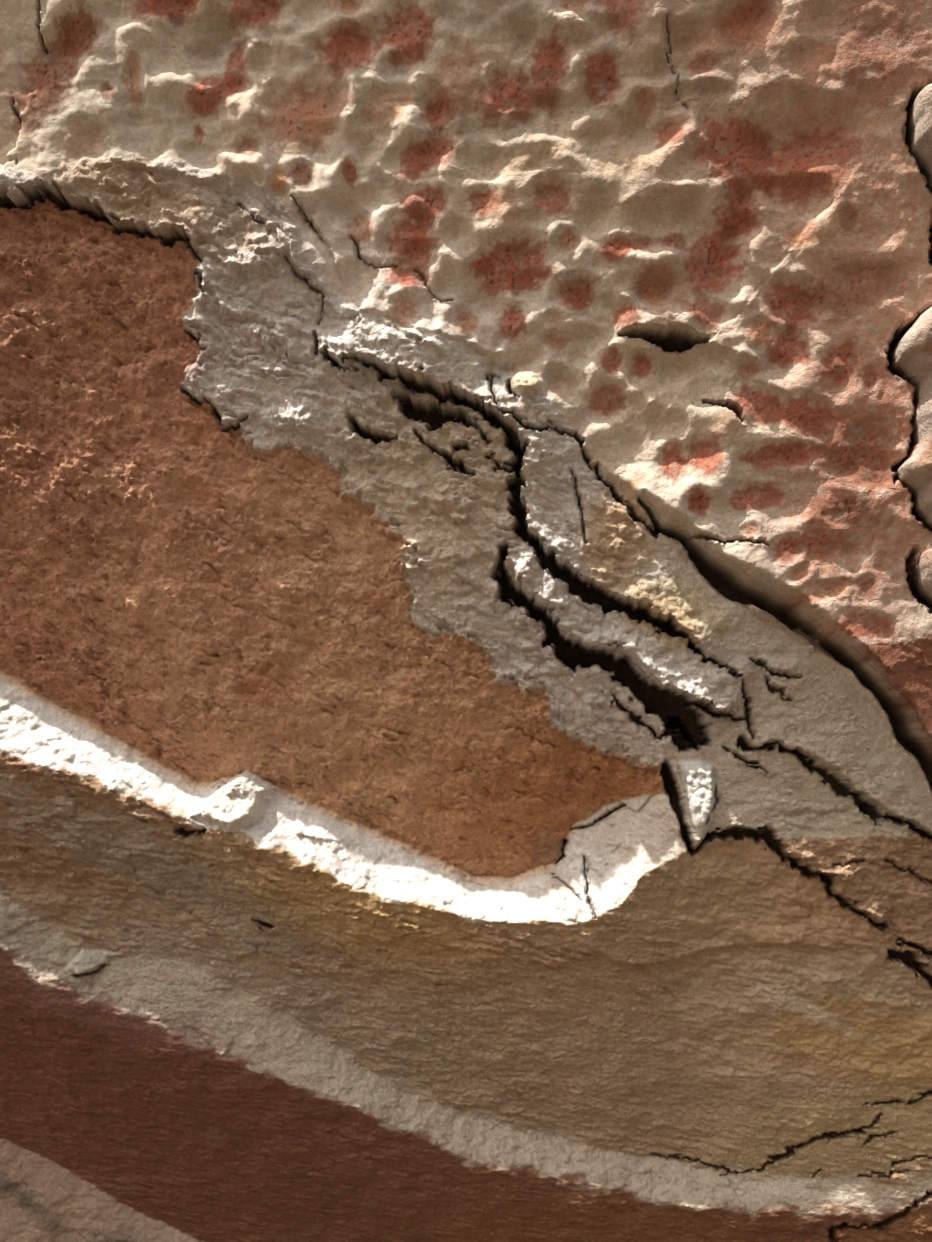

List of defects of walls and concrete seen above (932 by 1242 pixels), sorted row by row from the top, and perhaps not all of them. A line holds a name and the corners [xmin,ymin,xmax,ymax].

crack [35,0,50,55]
crack [10,97,22,125]
crack [0,178,205,293]
crack [236,201,264,226]
crack [290,193,454,303]
crack [901,76,932,266]
crack [178,384,249,432]
spalling [0,197,670,877]
corrosion [580,464,725,660]
crack [281,250,932,990]
crack [250,917,275,931]
crack [649,1090,932,1242]